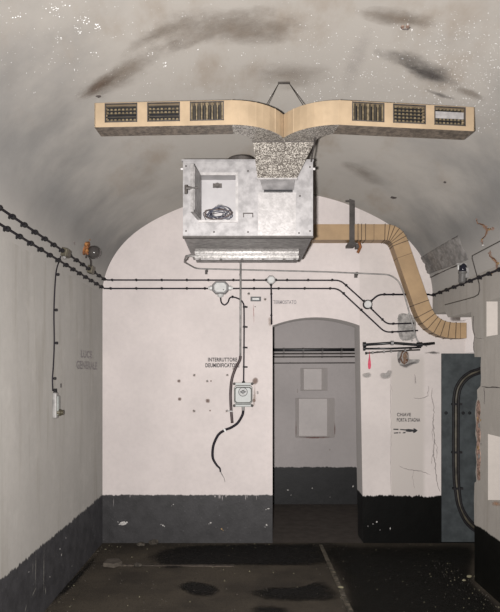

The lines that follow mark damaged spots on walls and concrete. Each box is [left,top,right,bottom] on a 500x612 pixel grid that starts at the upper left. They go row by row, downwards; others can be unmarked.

crack [390,374,440,491]
damp [156,544,495,612]